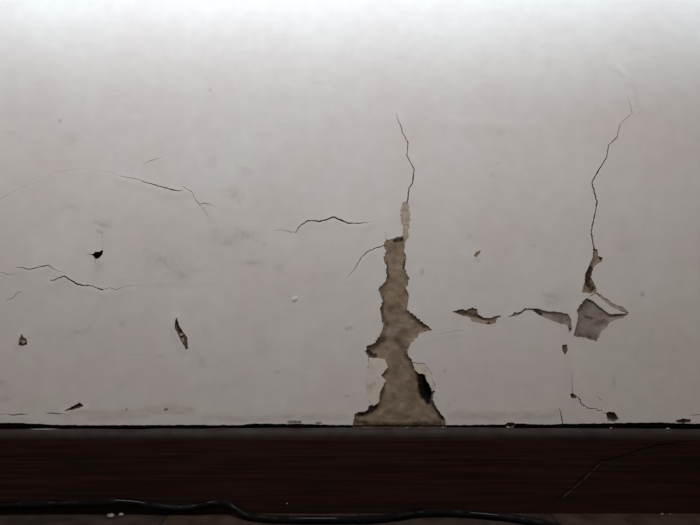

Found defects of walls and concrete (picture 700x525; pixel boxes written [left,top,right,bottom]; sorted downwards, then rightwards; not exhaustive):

crack [396,114,415,202]
crack [591,99,632,249]
crack [274,216,368,233]
crack [1,265,138,291]
spalling [175,318,188,349]
spalling [353,202,446,428]
spalling [452,249,628,341]